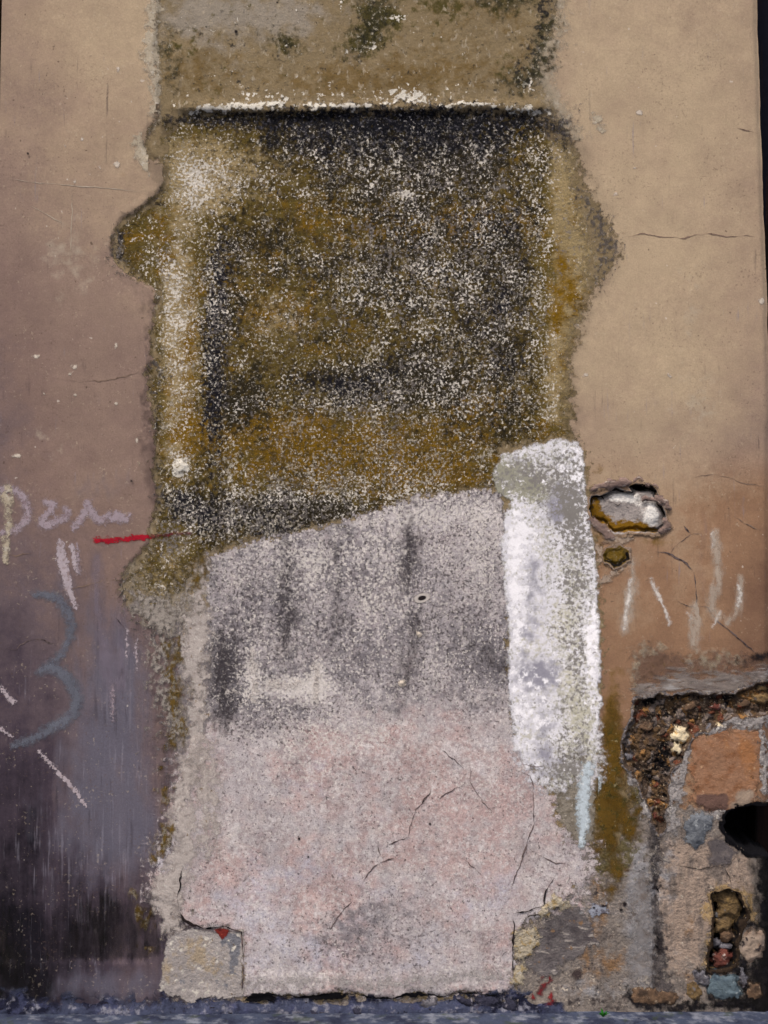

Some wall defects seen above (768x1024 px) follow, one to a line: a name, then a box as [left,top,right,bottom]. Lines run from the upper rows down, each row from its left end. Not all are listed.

crack [627,232,754,240]
peeling [110,0,674,802]
crack [661,526,754,652]
peeling [152,889,231,940]
crack [331,743,492,928]
peeling [201,640,768,1012]
crack [502,764,570,974]
leakage [593,700,663,895]